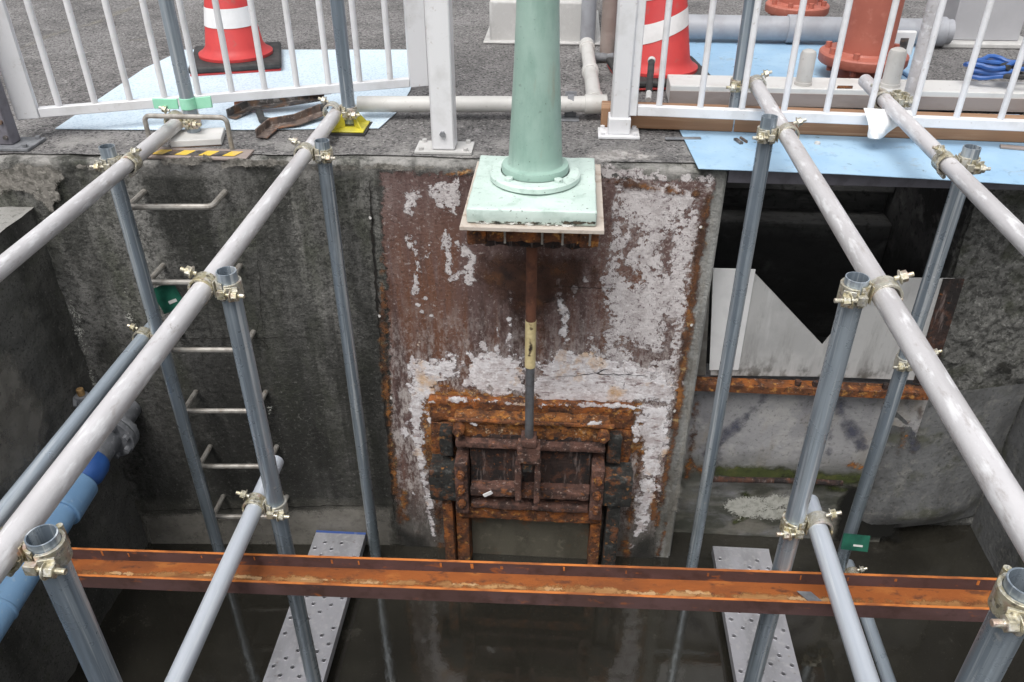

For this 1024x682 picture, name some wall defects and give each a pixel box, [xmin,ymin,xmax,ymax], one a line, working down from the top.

leakage [584,149,667,181]
leakage [680,173,714,187]
rust [420,384,540,480]
leakage [287,286,692,559]
leakage [144,514,240,544]
leakage [249,513,276,544]
rust [434,500,444,548]